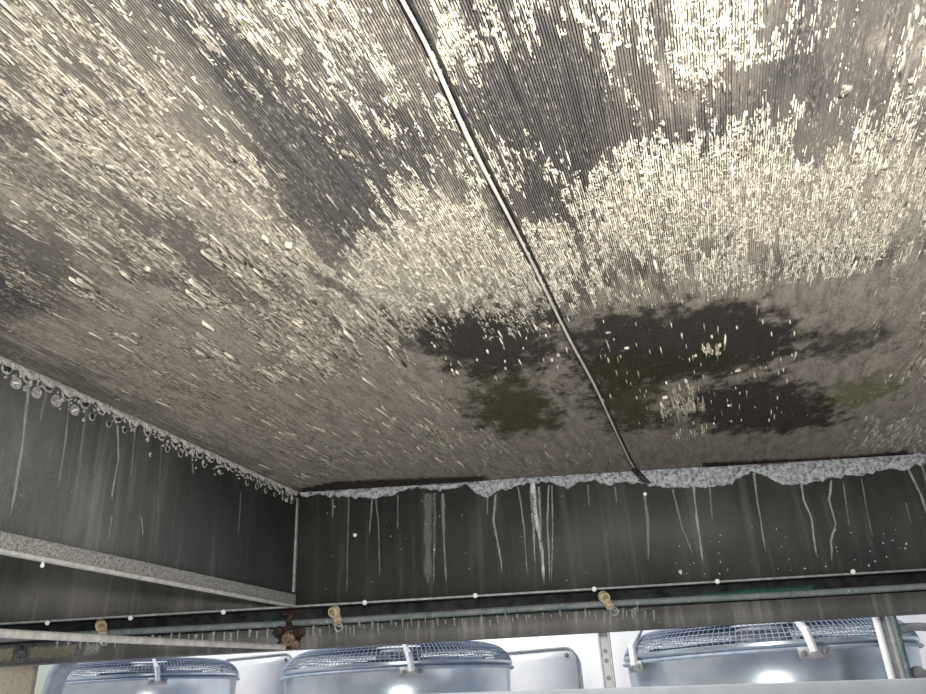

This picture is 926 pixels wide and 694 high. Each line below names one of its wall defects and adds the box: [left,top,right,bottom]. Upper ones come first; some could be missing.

peeling [0,0,926,502]
damp [0,355,926,578]
damp [380,294,890,436]